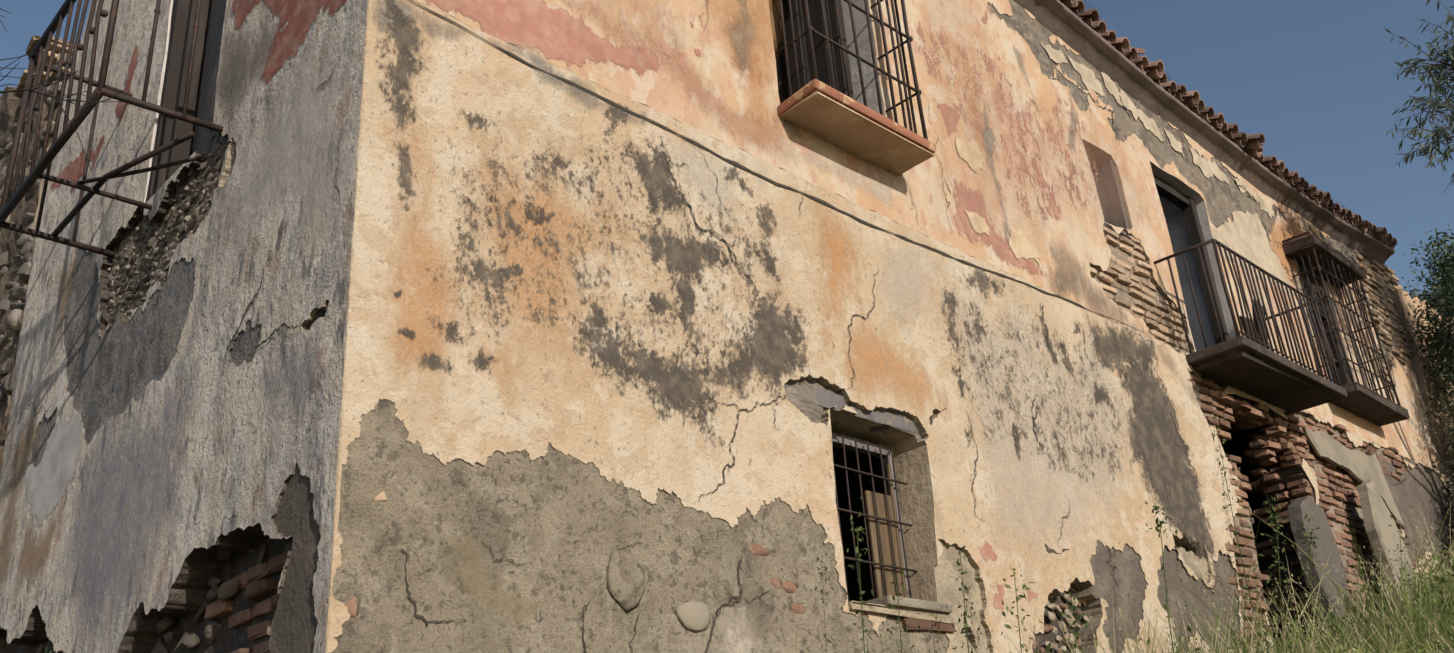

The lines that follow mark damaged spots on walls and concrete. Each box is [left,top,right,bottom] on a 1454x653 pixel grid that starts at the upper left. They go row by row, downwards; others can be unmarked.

spalling [25,132,236,527]
crack [202,228,299,373]
peeling [232,0,346,84]
peeling [425,0,701,75]
damp [396,49,815,447]
spalling [267,398,1004,653]
crack [699,395,787,500]
crack [411,0,1143,388]
crack [1032,395,1044,446]
damp [940,250,1216,559]
spalling [916,0,1414,390]
spalling [1089,207,1454,653]